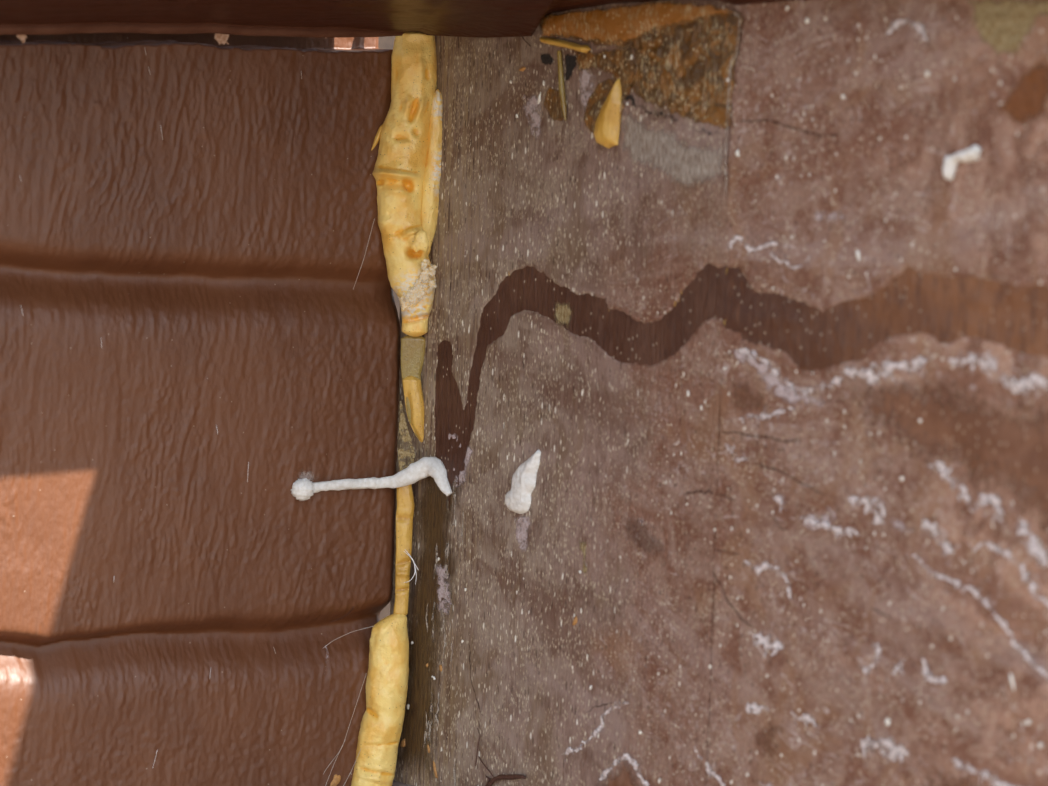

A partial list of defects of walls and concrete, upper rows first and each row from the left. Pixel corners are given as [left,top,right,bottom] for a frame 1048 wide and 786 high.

peeling [434,263,1048,531]
damp [735,348,927,425]
damp [948,352,1048,395]
damp [799,511,859,542]
damp [848,496,904,529]
damp [928,461,1004,523]
damp [744,561,791,600]
damp [973,519,1048,607]
damp [912,554,1048,679]
damp [754,632,784,657]
damp [860,736,909,762]
damp [952,757,1012,786]